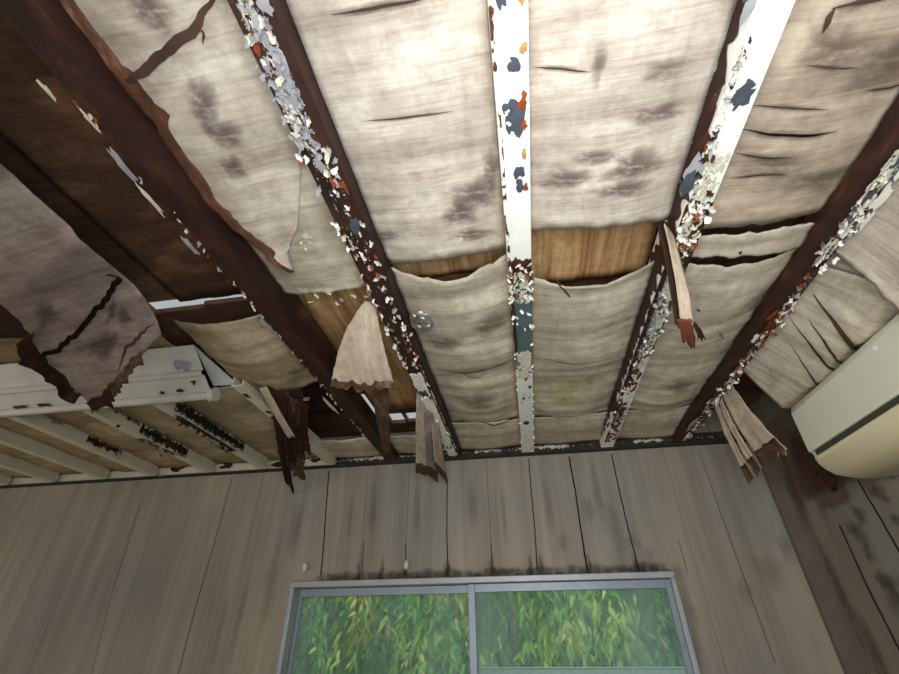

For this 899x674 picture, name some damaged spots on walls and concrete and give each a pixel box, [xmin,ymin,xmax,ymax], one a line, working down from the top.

peeling [739,0,757,26]
crack [822,0,882,33]
peeling [72,100,101,133]
peeling [676,36,757,273]
peeling [106,146,209,258]
peeling [235,0,574,456]
peeling [217,267,282,338]
peeling [604,266,672,442]
peeling [682,149,899,441]
crack [790,294,860,385]
rust [86,435,122,456]
rust [112,408,189,472]